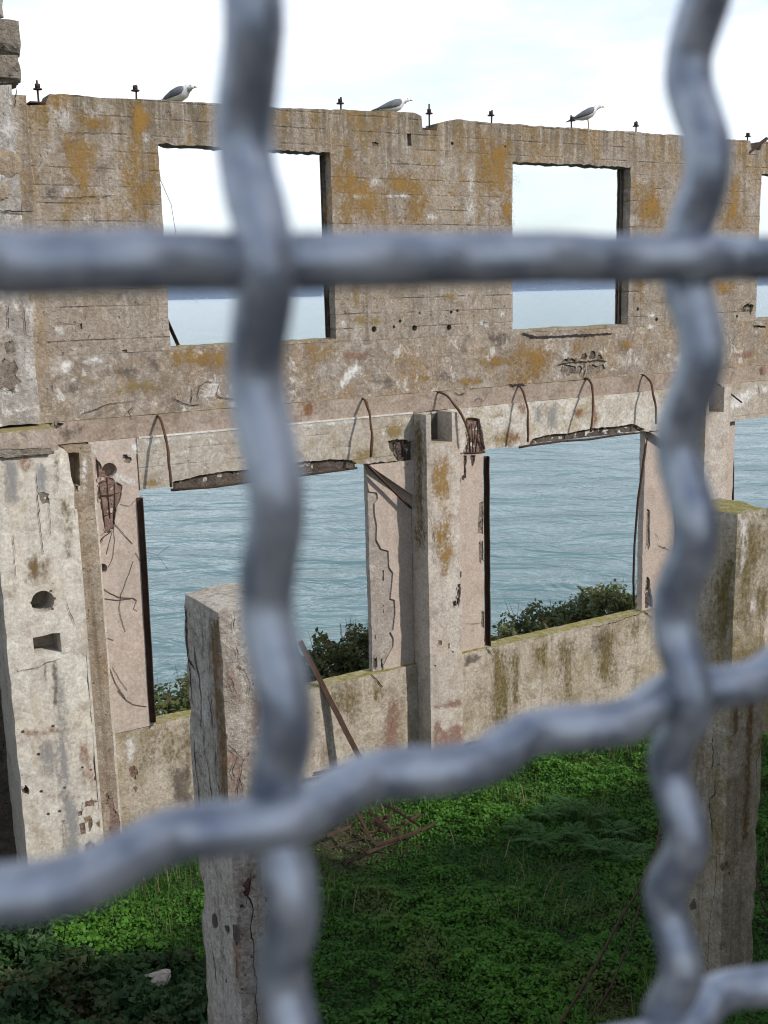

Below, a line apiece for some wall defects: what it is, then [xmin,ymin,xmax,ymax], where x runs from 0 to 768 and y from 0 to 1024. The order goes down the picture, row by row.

spalling [559,351,604,376]
spalling [519,424,646,449]
spalling [388,438,414,468]
spalling [302,459,358,476]
spalling [171,470,246,491]
rust [434,722,463,745]
crack [212,873,258,1023]